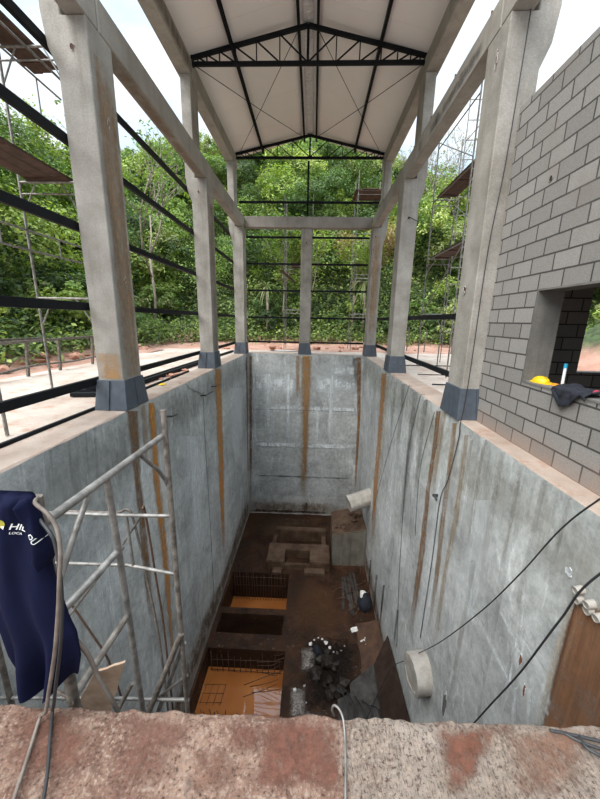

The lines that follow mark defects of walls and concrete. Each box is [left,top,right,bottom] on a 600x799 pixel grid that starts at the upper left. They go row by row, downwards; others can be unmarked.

corrosion [128,403,173,646]
corrosion [216,369,224,533]
corrosion [296,356,310,476]
corrosion [373,373,386,515]
corrosion [412,411,445,605]
corrosion [434,423,464,582]